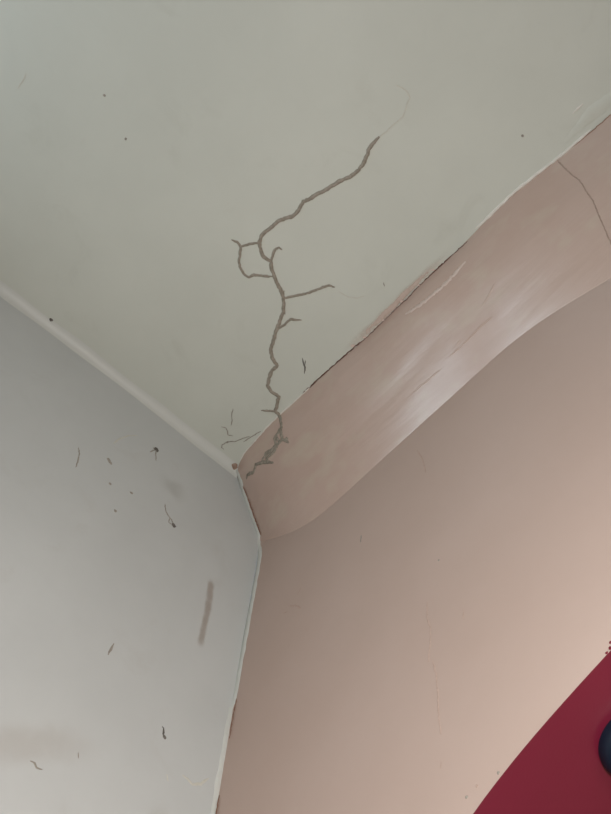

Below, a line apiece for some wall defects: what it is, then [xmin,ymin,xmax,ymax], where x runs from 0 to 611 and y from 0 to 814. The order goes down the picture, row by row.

crack [557,160,611,244]
crack [221,85,410,535]
crack [303,242,467,393]